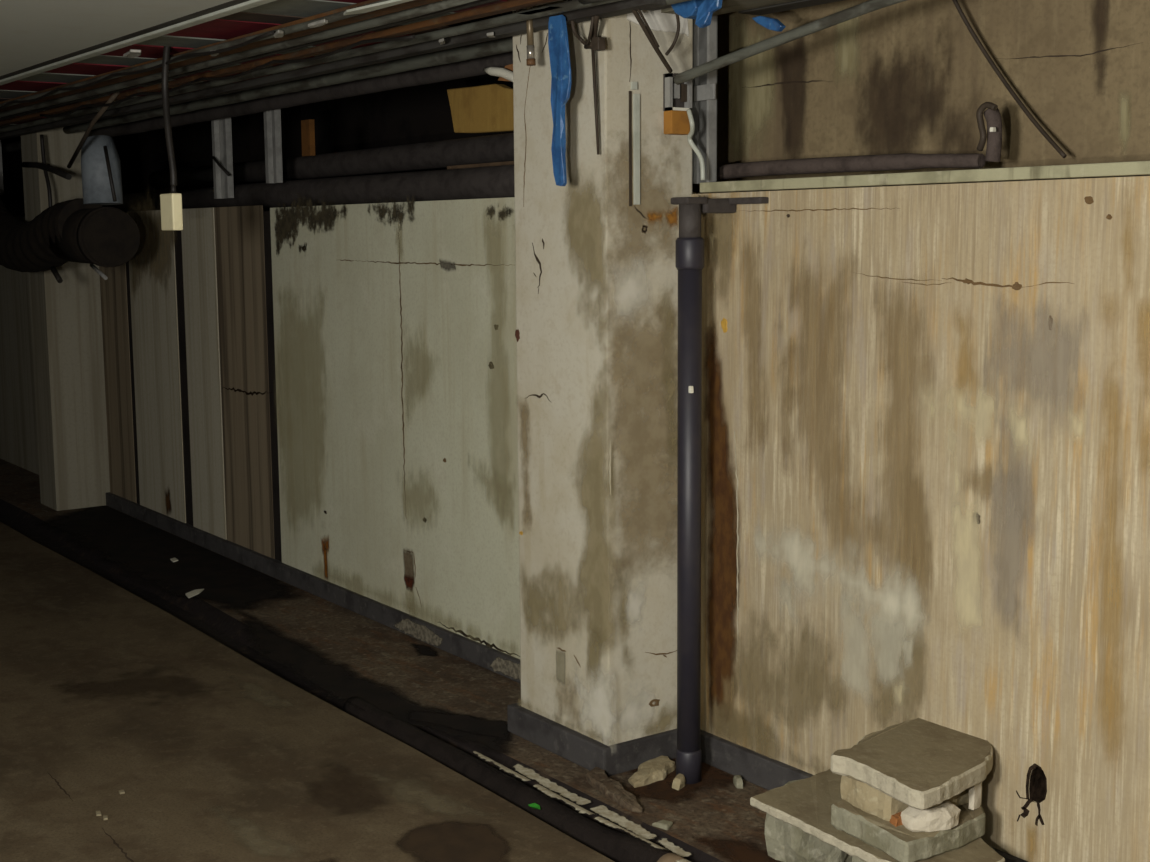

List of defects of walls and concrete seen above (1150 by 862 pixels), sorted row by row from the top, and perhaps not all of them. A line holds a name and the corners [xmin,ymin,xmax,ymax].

damp [863,62,972,155]
damp [275,198,346,255]
damp [368,196,414,230]
damp [487,206,512,220]
damp [701,213,732,291]
crack [853,272,1073,288]
damp [521,405,530,522]
damp [523,150,678,744]
corrosion [705,328,739,726]
damp [714,248,925,759]
damp [949,345,1032,626]
damp [397,822,509,862]